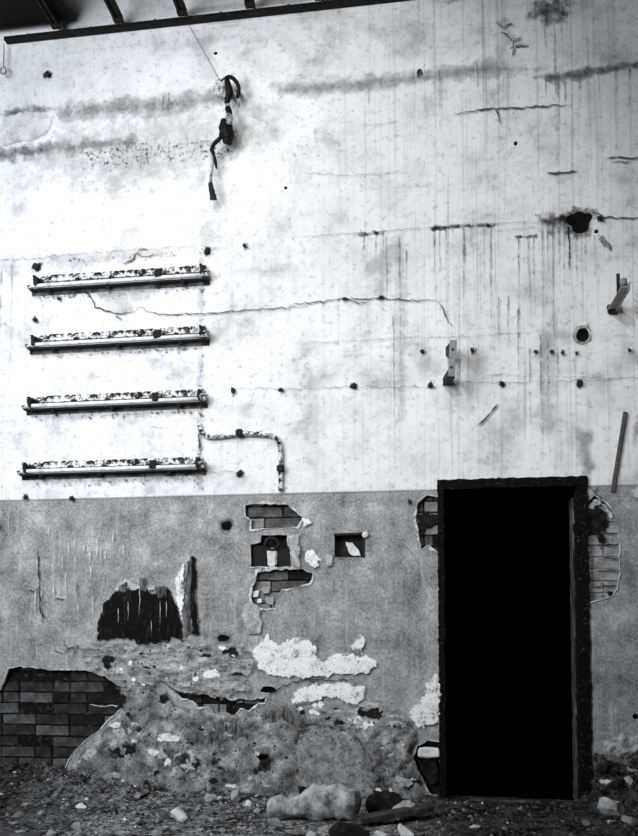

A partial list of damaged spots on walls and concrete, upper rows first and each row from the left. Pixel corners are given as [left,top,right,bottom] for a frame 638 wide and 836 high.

water stain [285,63,506,93]
water stain [545,62,638,90]
water stain [63,92,218,117]
crack [458,104,569,122]
water stain [542,219,586,268]
crack [72,289,527,338]
water stain [581,433,592,472]
flaking render [243,501,311,536]
flaking render [414,495,438,553]
flaking render [587,495,621,603]
flaking render [249,564,314,611]
spalling [0,633,441,800]